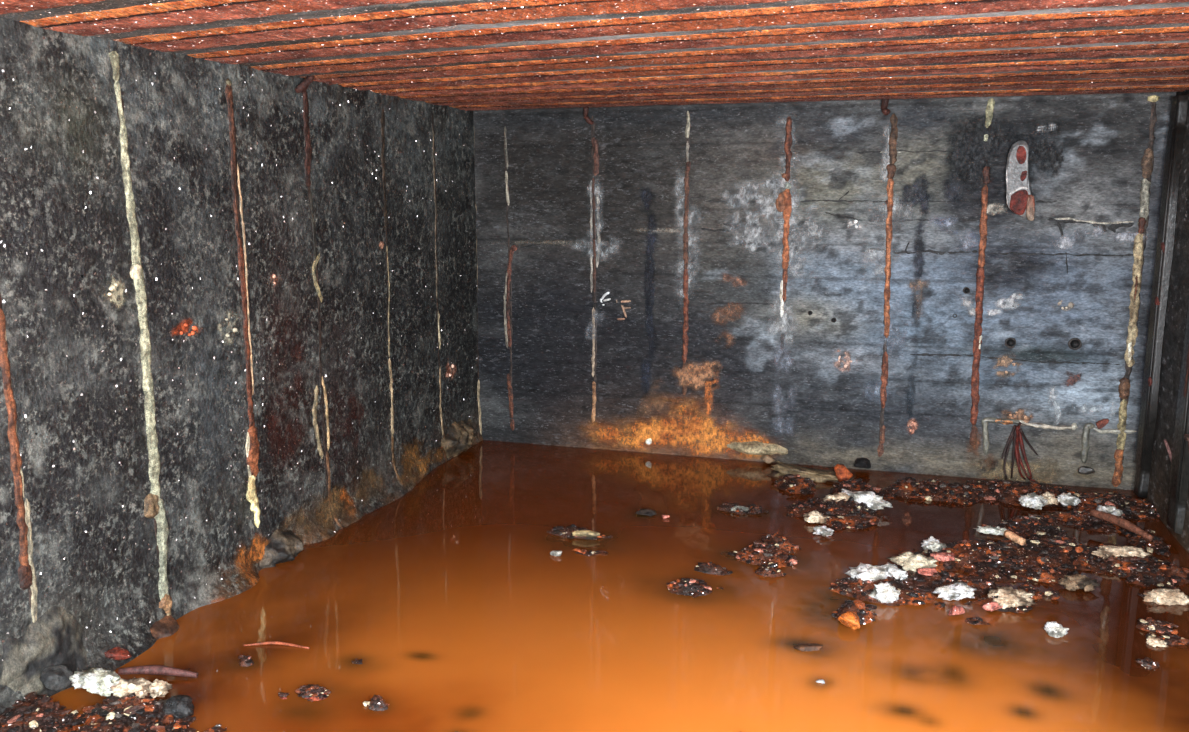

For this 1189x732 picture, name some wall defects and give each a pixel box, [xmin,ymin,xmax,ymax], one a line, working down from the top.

damp [543,184,615,257]
corrosion [596,362,769,457]